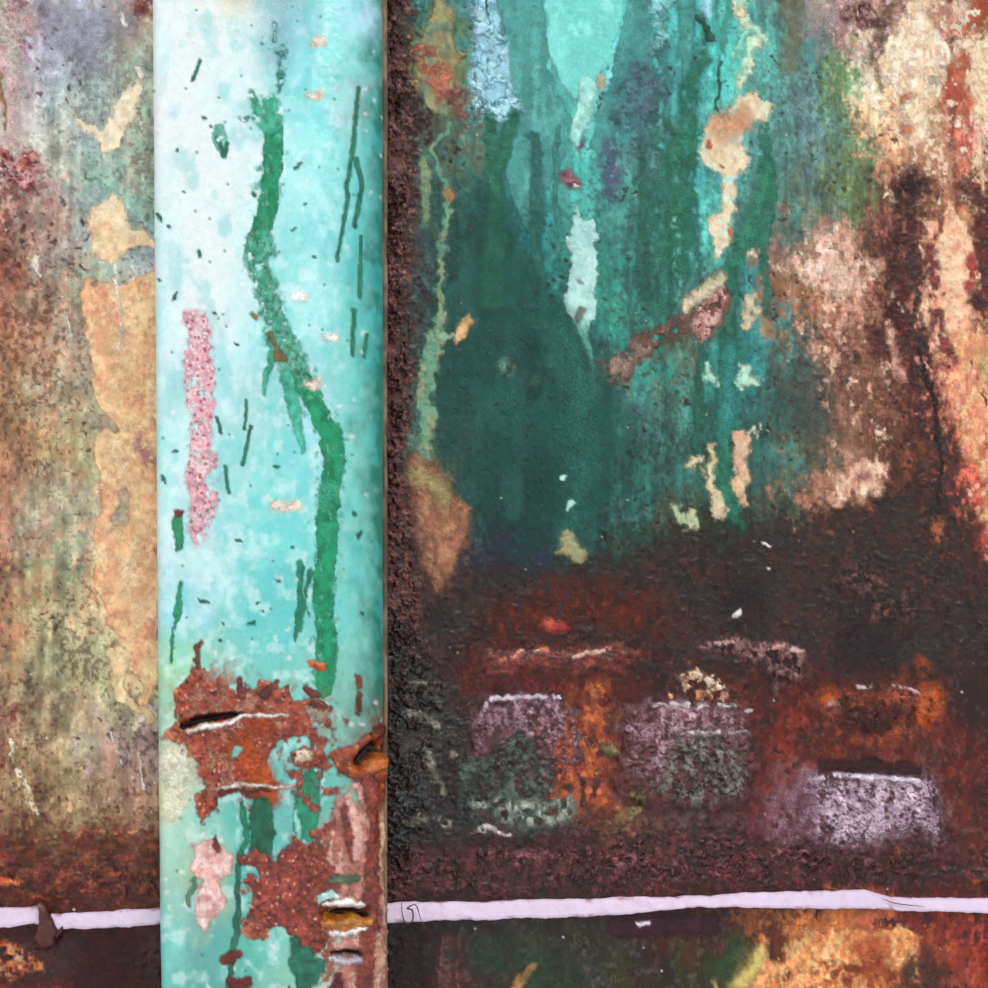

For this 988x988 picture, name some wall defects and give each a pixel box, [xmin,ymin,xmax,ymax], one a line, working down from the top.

corrosion [0,148,53,202]
peeling [698,0,772,258]
corrosion [387,0,988,902]
peeling [159,729,196,826]
corrosion [0,825,160,981]
peeling [186,835,234,932]
peeling [317,773,388,988]
corrosion [892,949,950,988]